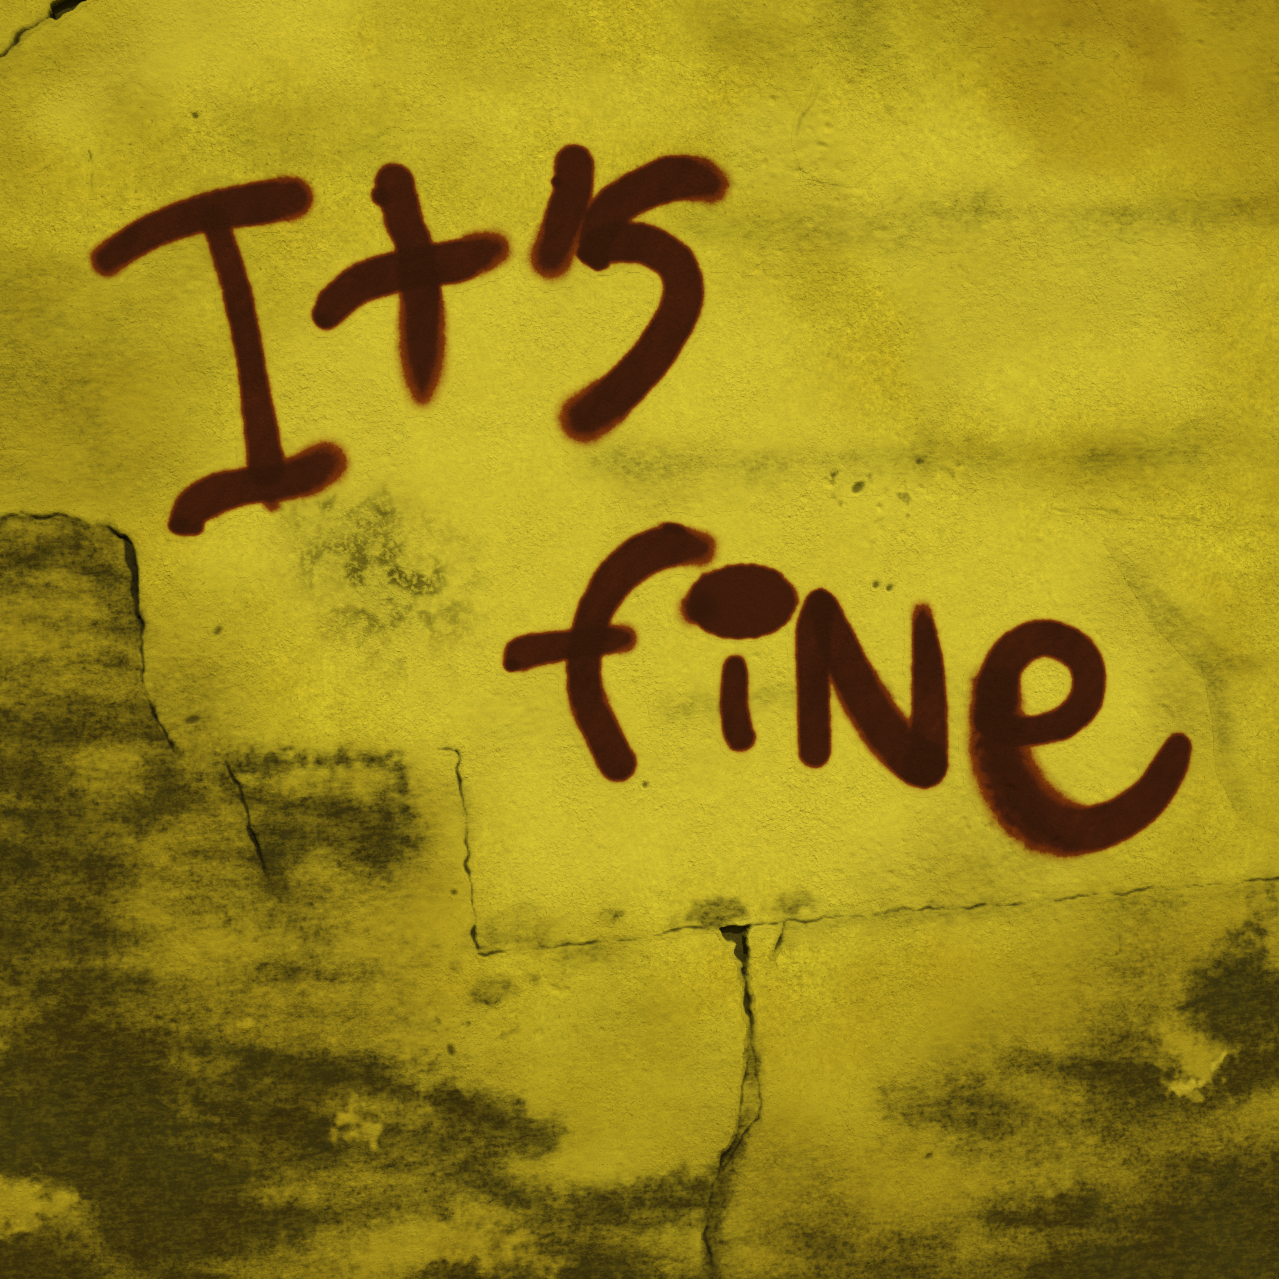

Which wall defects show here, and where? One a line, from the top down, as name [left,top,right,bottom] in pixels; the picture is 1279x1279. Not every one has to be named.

crack [0,0,94,60]
crack [0,507,187,762]
damp [236,469,529,710]
crack [219,758,271,879]
damp [0,520,776,1279]
crack [432,743,1279,1279]
damp [665,865,1279,1279]